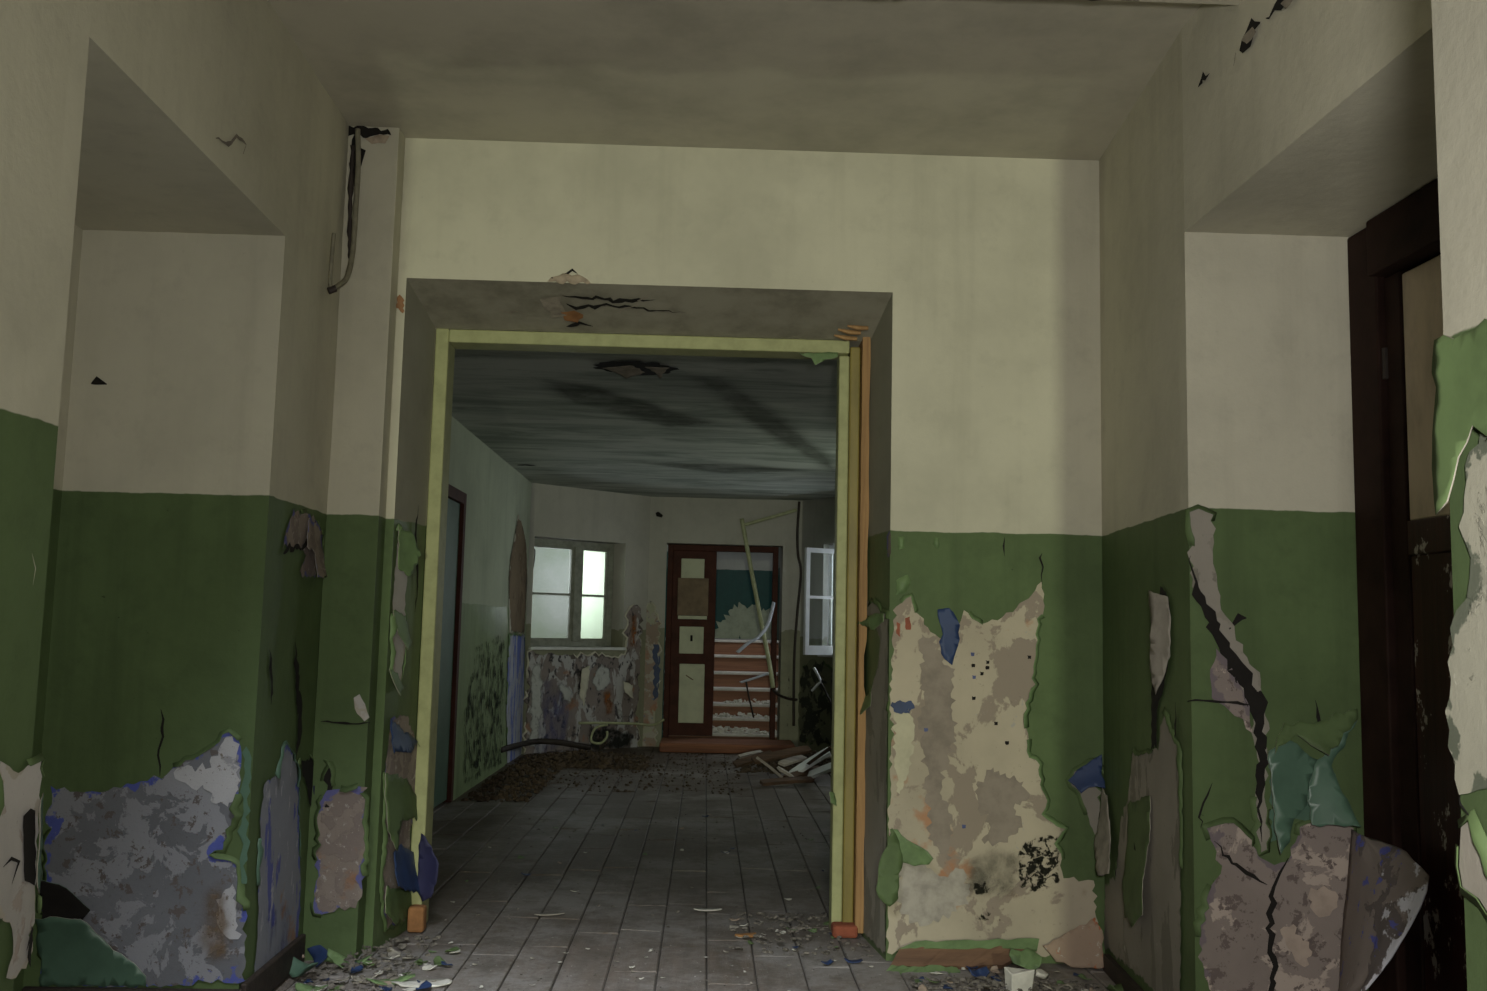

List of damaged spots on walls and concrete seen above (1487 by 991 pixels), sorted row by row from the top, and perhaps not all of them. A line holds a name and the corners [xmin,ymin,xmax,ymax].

crack [500,295,686,327]
peeling [0,715,461,991]
peeling [282,509,327,581]
peeling [354,694,369,721]
peeling [389,515,422,696]
peeling [463,515,662,783]
peeling [857,582,1430,991]
crack [1174,504,1272,856]
peeling [1432,319,1487,921]